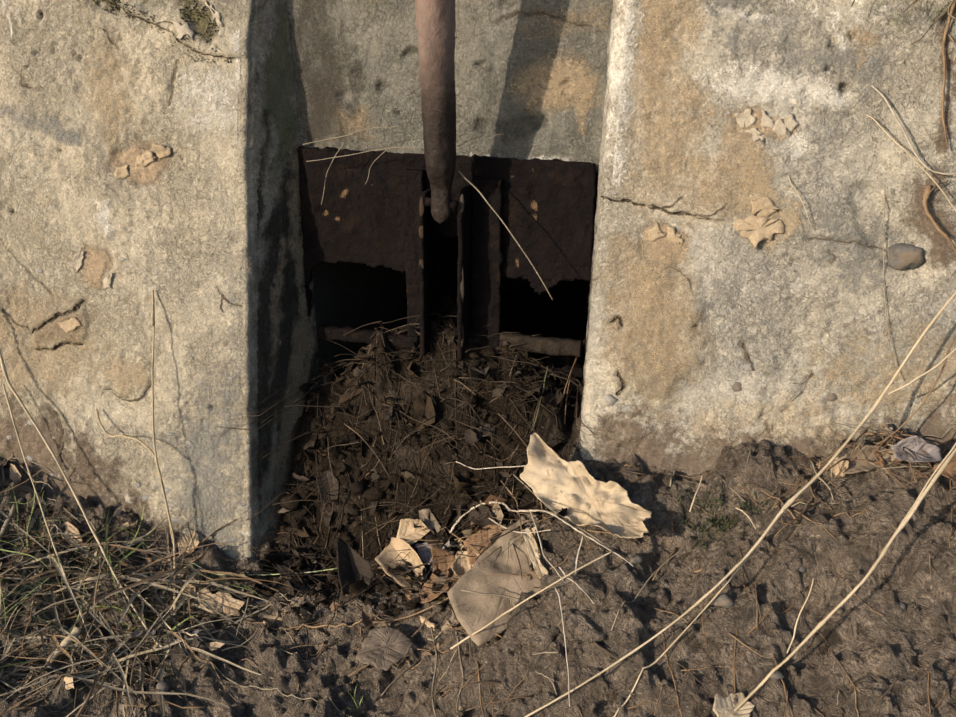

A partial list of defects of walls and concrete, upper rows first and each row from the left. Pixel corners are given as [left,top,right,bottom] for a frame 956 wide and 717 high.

crack [111,0,237,105]
damp [289,0,361,147]
crack [601,196,727,221]
crack [805,237,887,264]
damp [257,110,316,518]